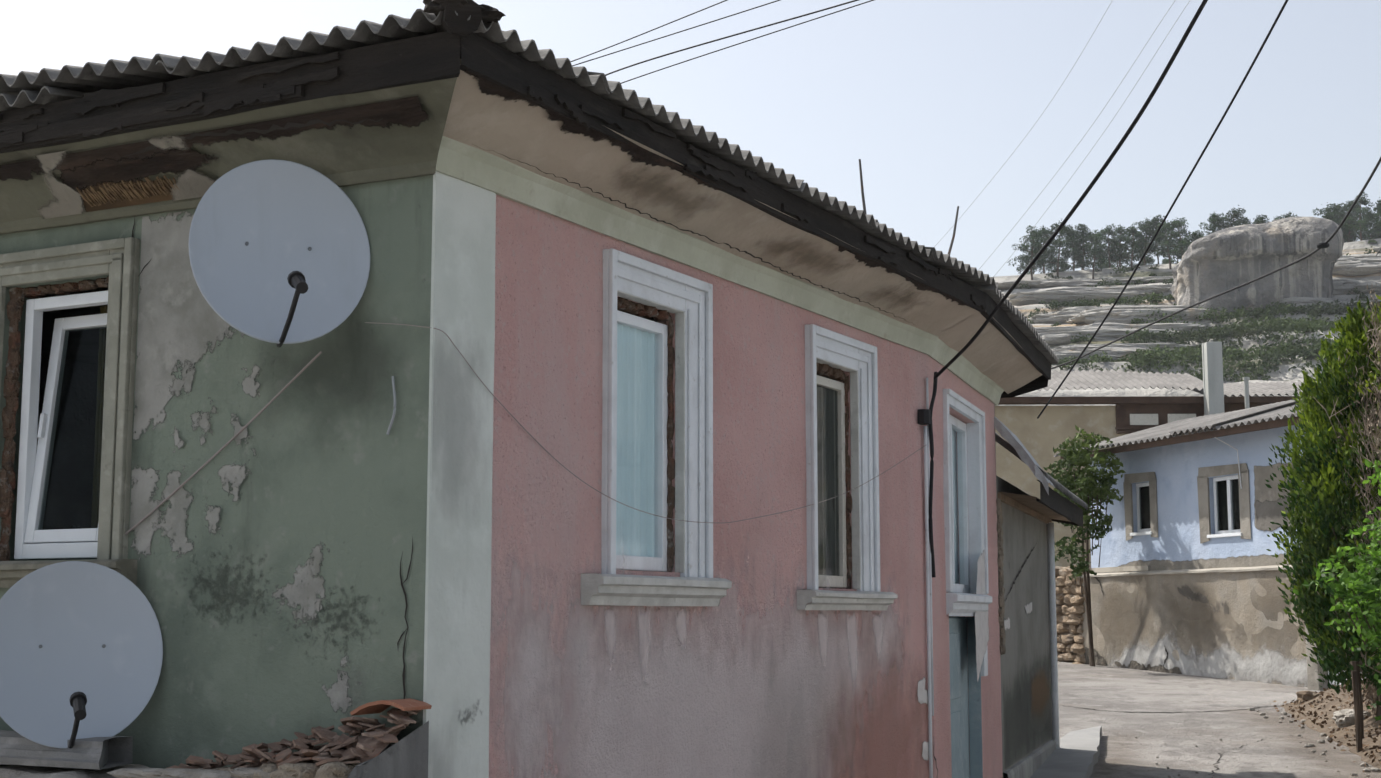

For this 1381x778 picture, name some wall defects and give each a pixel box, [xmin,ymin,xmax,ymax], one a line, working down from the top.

peeling [0,96,428,561]
peeling [272,542,330,627]
spalling [1084,647,1182,674]
crack [1069,706,1296,778]